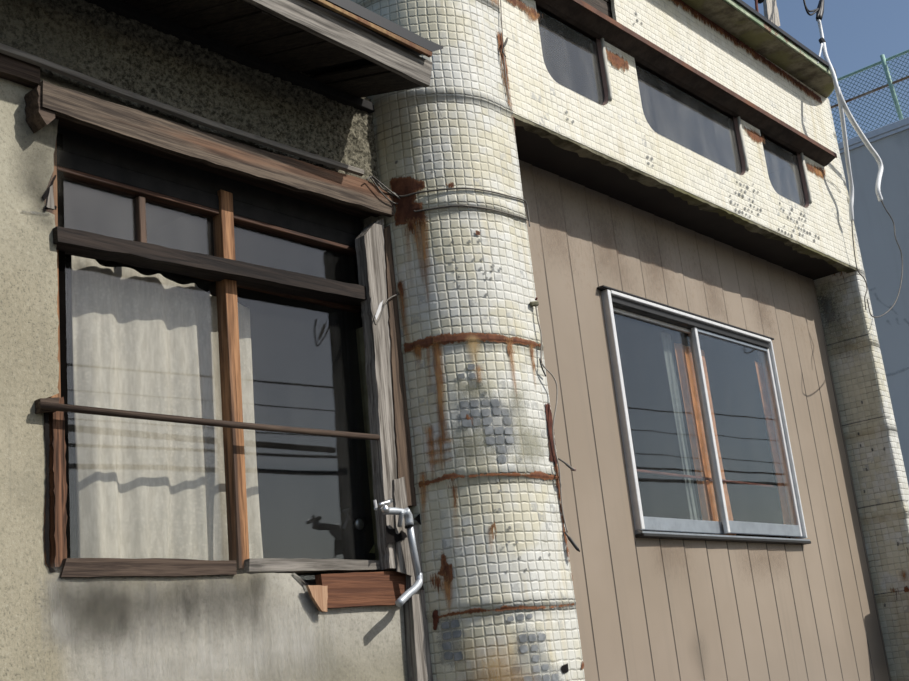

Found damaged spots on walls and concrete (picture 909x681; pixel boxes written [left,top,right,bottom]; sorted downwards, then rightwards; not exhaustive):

corrosion [497,31,516,131]
corrosion [495,0,540,21]
corrosion [606,48,629,72]
corrosion [671,0,823,105]
corrosion [390,176,428,270]
corrosion [404,332,541,463]
corrosion [419,403,570,561]
spalling [292,573,321,613]
corrosion [423,554,453,602]
corrosion [432,603,575,630]